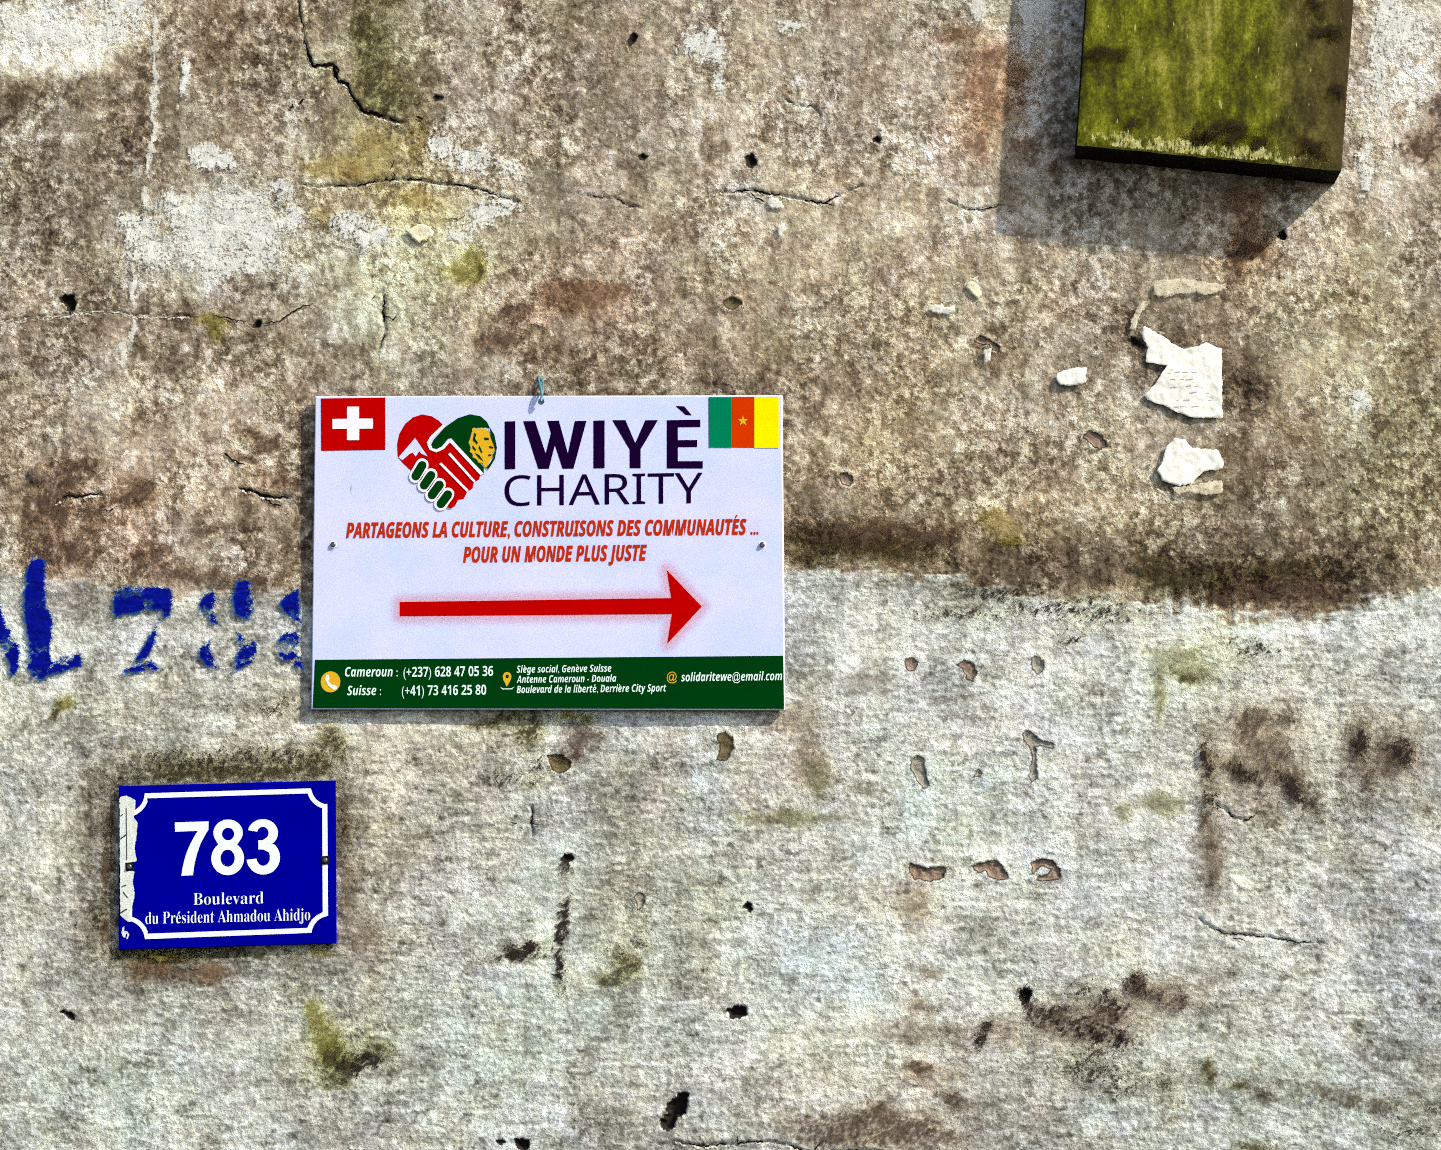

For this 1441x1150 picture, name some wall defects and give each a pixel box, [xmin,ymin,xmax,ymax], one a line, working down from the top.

crack [290,0,423,126]
damp [350,0,418,118]
crack [0,303,314,325]
spalling [716,730,736,762]
spalling [1020,728,1056,783]
damp [1345,719,1428,788]
damp [1198,695,1322,891]
spalling [907,861,949,883]
spalling [970,859,1009,880]
spalling [1030,856,1064,881]
damp [973,1011,998,1052]
damp [1017,965,1205,1100]